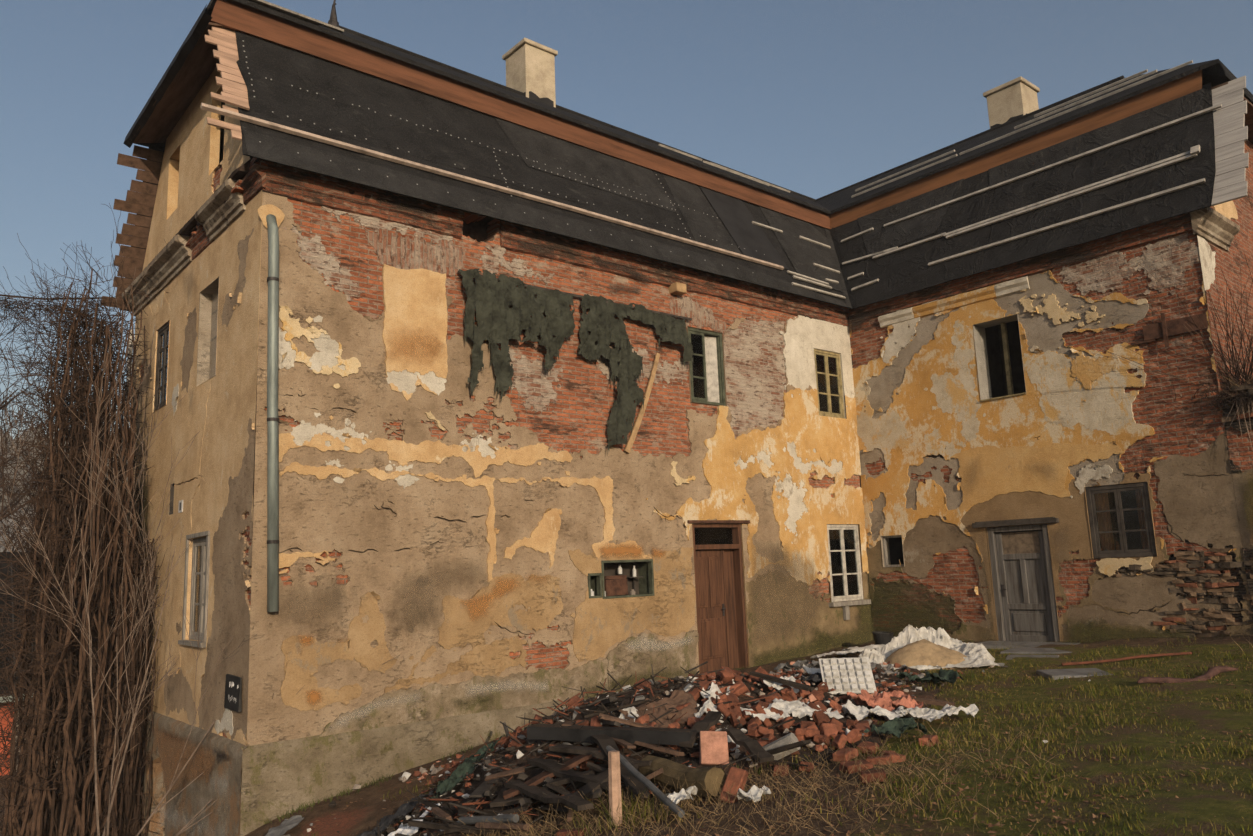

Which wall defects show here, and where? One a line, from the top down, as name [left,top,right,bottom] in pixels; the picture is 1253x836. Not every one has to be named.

flaking render [212,165,223,192]
spalling [221,228,254,327]
spalling [172,307,198,416]
flaking render [264,199,1253,711]
spalling [164,418,255,745]